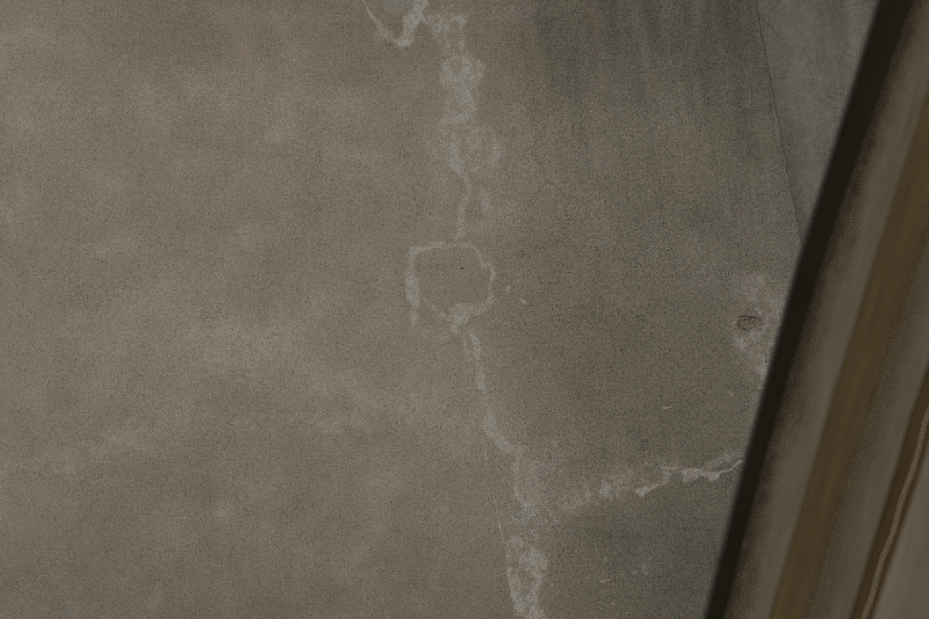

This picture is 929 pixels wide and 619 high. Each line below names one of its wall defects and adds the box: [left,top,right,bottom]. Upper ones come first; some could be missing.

damp [365,0,556,619]
damp [664,459,743,481]